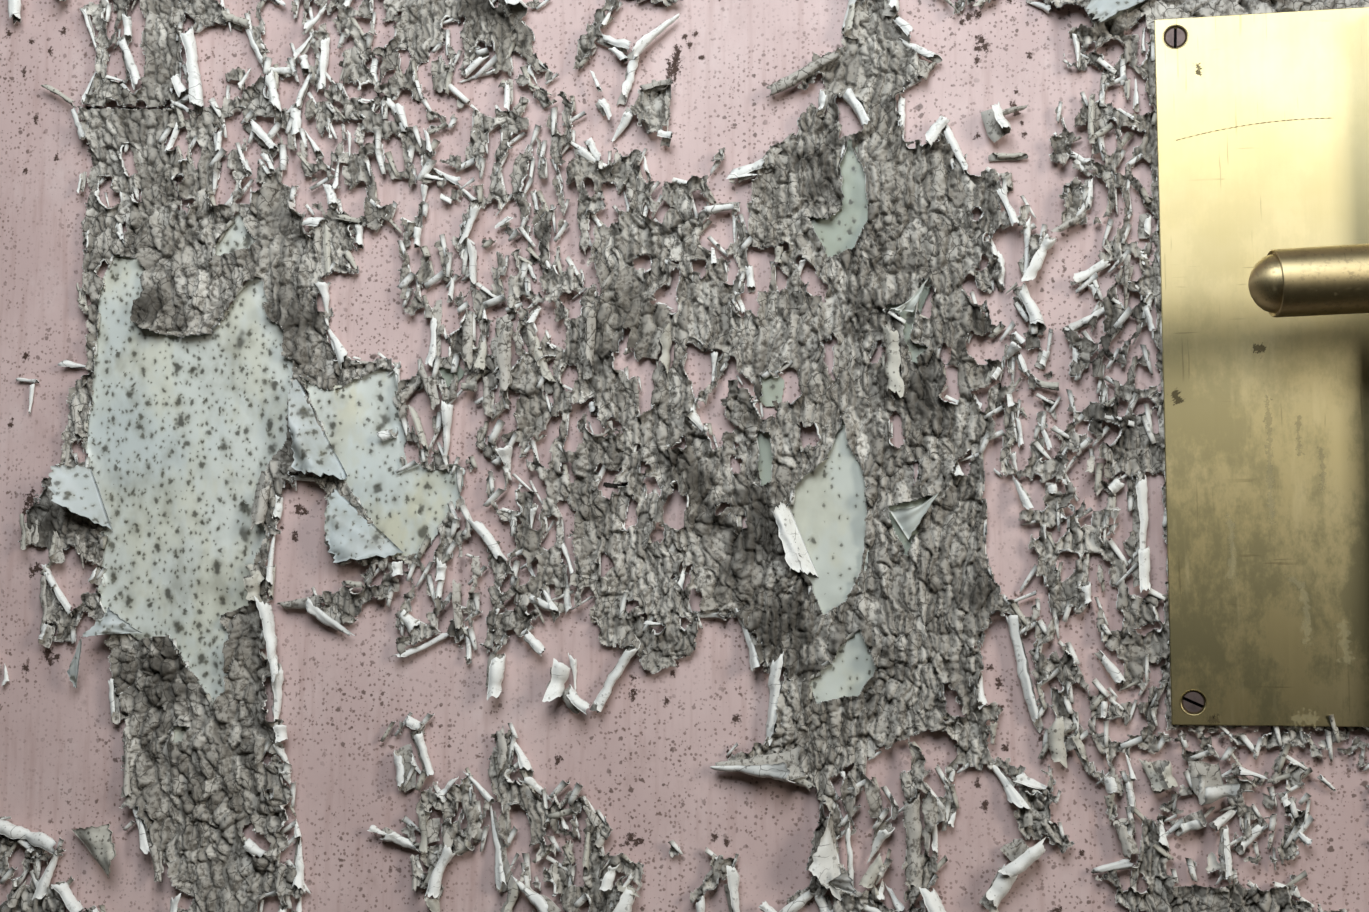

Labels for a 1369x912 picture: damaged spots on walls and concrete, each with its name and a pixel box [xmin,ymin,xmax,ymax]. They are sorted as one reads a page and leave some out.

peeling [8,0,21,24]
peeling [0,816,106,912]
peeling [16,0,569,912]
peeling [276,0,1369,912]